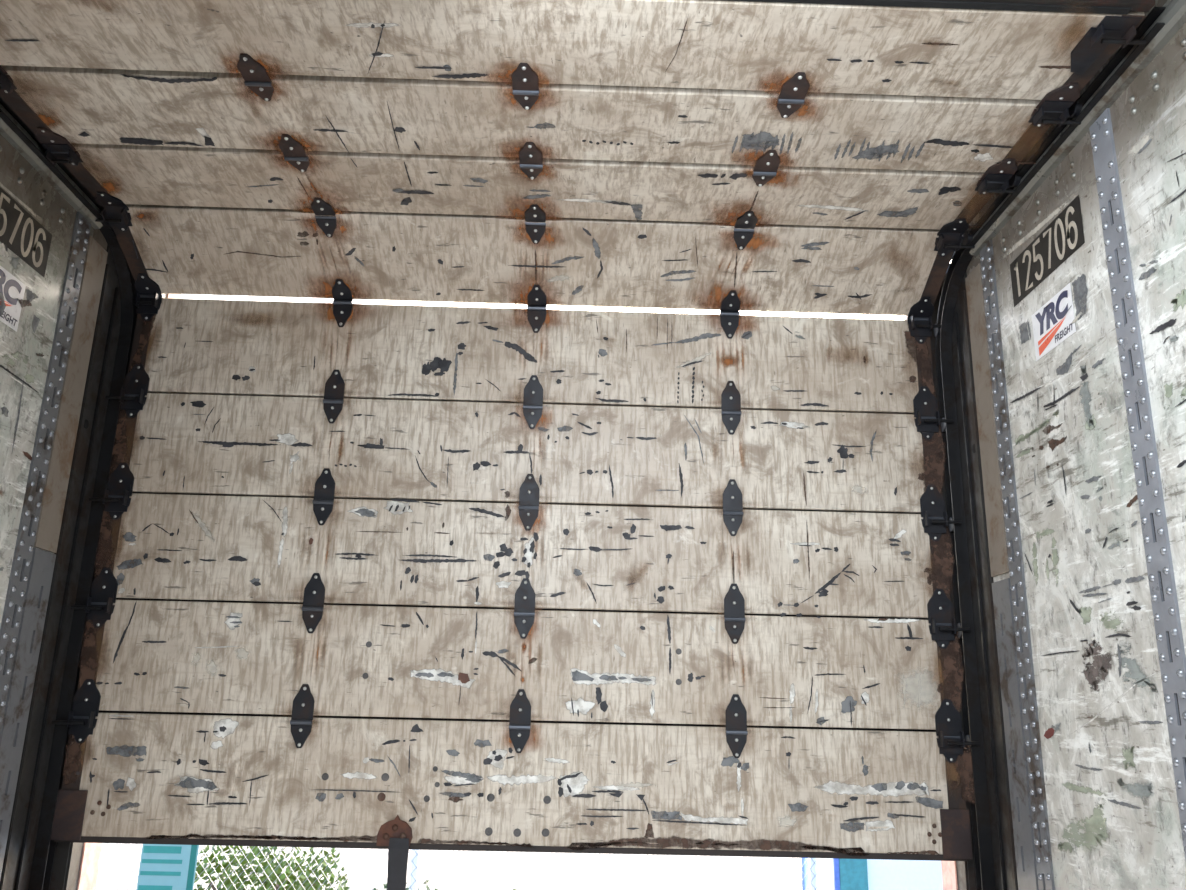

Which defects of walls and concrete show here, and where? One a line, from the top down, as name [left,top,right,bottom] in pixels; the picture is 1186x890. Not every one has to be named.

corrosion [793,79,815,117]
corrosion [271,132,347,236]
corrosion [508,201,558,326]
corrosion [707,150,787,333]
corrosion [312,278,363,322]
corrosion [918,426,946,494]
corrosion [924,527,954,599]
corrosion [79,619,101,688]
corrosion [937,631,964,713]
corrosion [62,734,85,785]